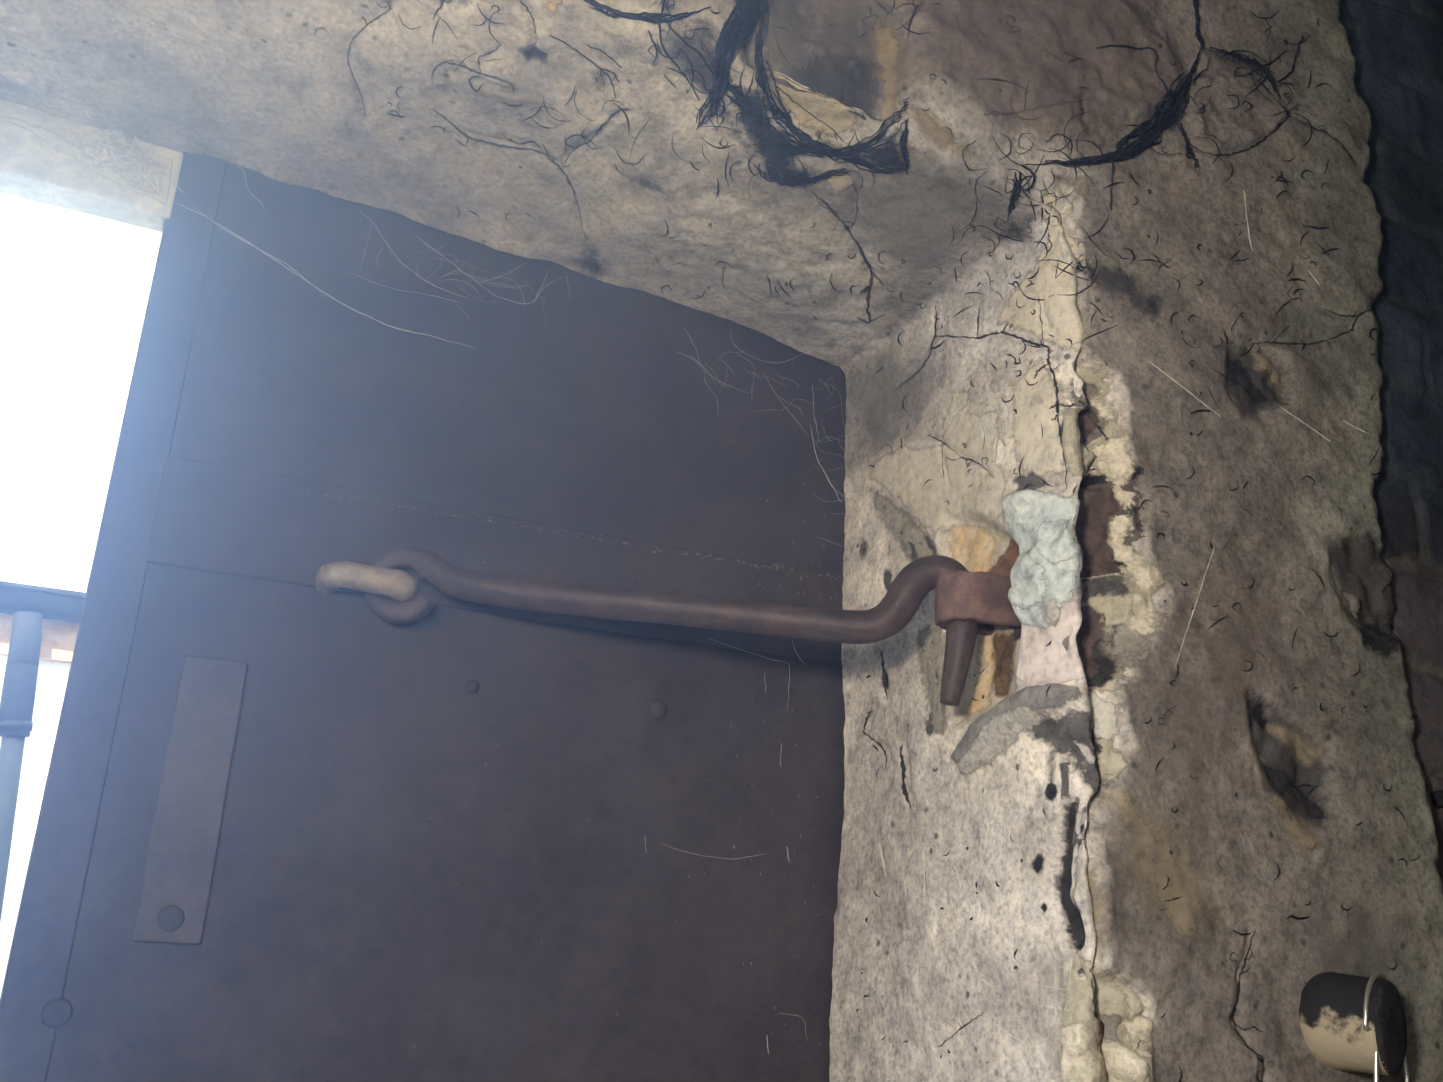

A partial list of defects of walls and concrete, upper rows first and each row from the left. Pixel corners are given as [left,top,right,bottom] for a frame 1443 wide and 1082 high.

crack [445,0,547,85]
crack [434,109,632,238]
crack [1189,75,1360,170]
crack [811,183,884,324]
crack [893,298,1109,489]
rust [951,524,1020,577]
spalling [870,186,1165,800]
rust [961,625,1021,720]
flaking render [1249,697,1327,850]
spalling [1032,854,1043,873]
peeling [1070,812,1082,907]
spalling [1045,953,1153,1082]